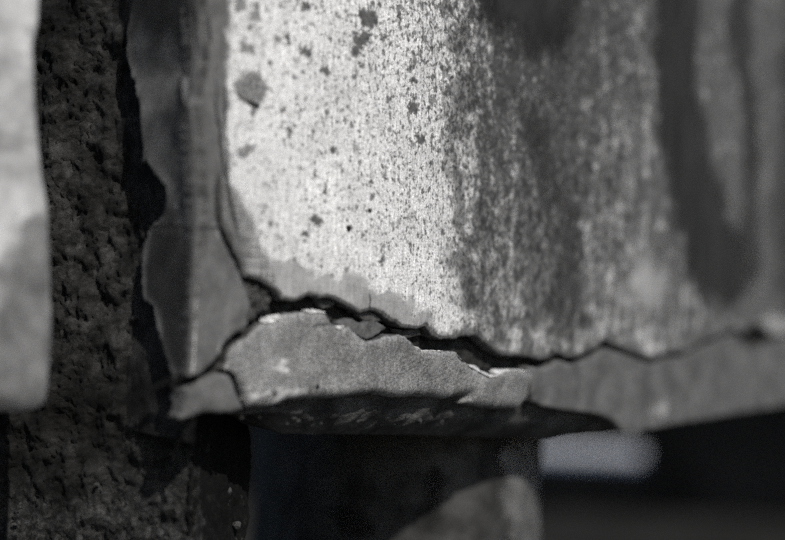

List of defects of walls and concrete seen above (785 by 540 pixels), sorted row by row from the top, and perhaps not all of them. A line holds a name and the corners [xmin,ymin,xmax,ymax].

crack [121,278,678,413]
crack [704,328,776,349]